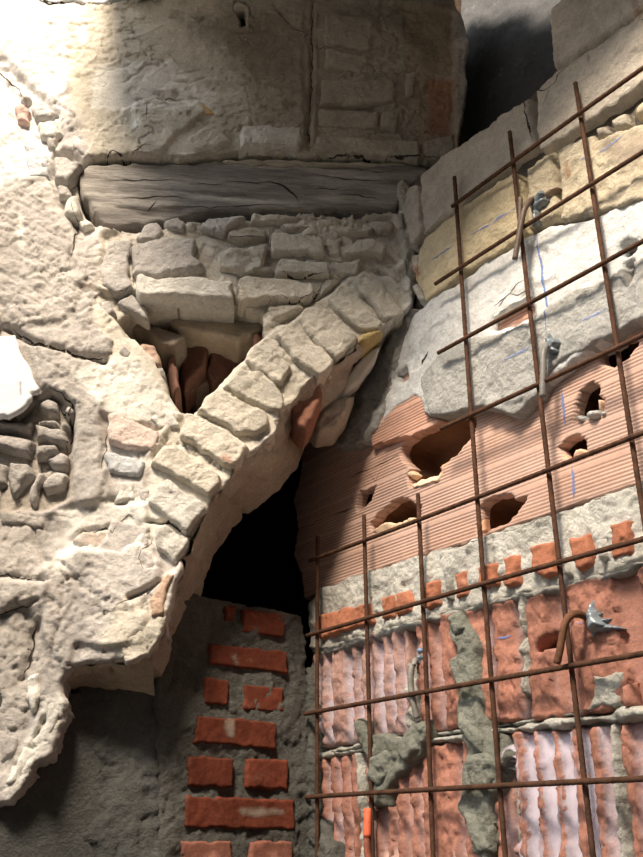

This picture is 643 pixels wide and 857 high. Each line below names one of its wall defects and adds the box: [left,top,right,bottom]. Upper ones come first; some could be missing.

peeling [72,135,89,161]
crack [13,329,106,360]
spalling [133,319,263,429]
spalling [303,65,643,857]
peeling [99,520,150,558]